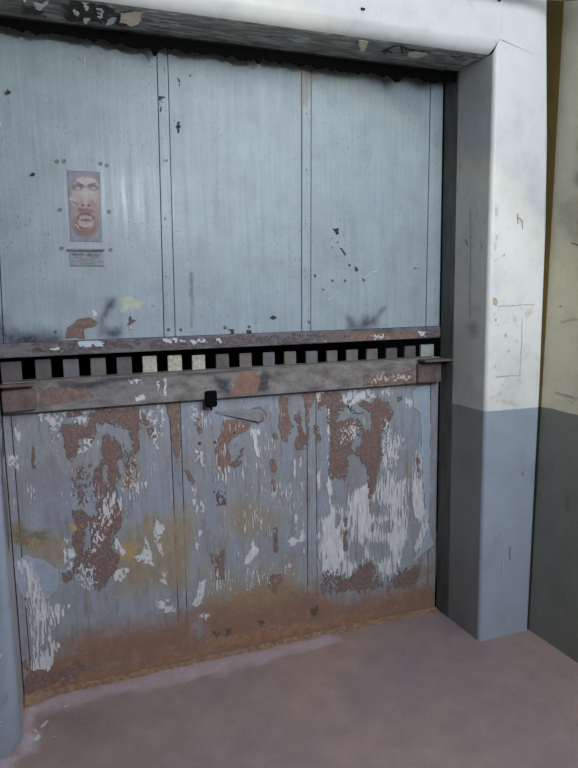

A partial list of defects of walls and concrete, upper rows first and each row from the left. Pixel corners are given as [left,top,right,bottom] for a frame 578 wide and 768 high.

spalling [61,1,186,28]
peeling [15,457,165,672]
rust [39,379,156,591]
peeling [128,378,167,450]
rust [32,317,427,353]
rust [215,406,267,475]
rust [218,370,268,396]
peeling [190,404,306,620]
rust [273,389,402,506]
peeling [315,386,434,580]
peeling [342,371,411,406]
rust [23,560,435,693]